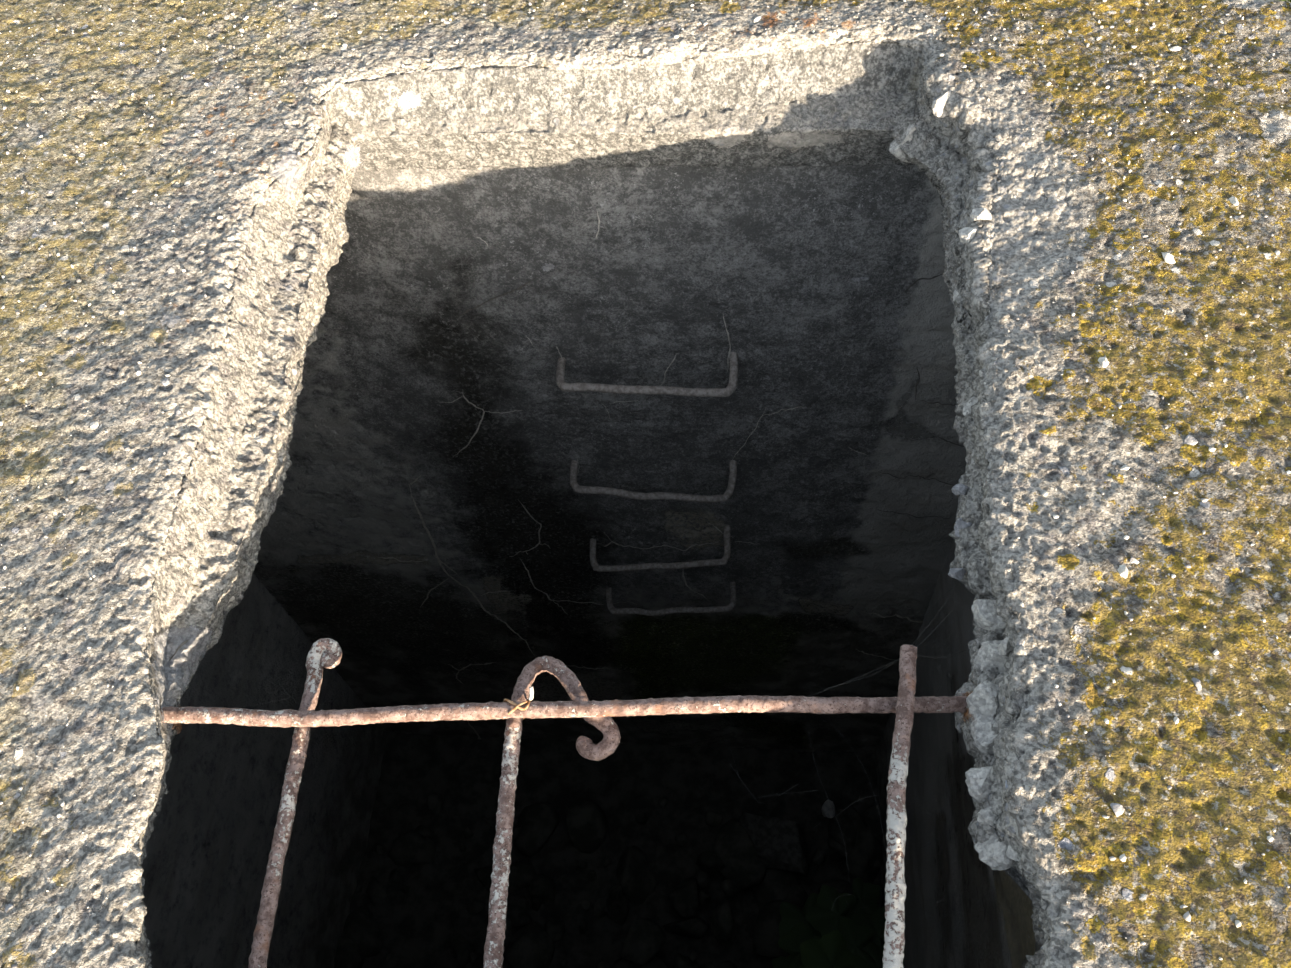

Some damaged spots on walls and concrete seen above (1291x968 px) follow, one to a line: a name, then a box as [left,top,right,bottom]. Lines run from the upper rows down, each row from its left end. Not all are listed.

leakage [257,303,660,702]
spalling [152,625,215,736]
leakage [633,712,804,747]
spalling [954,597,1045,881]